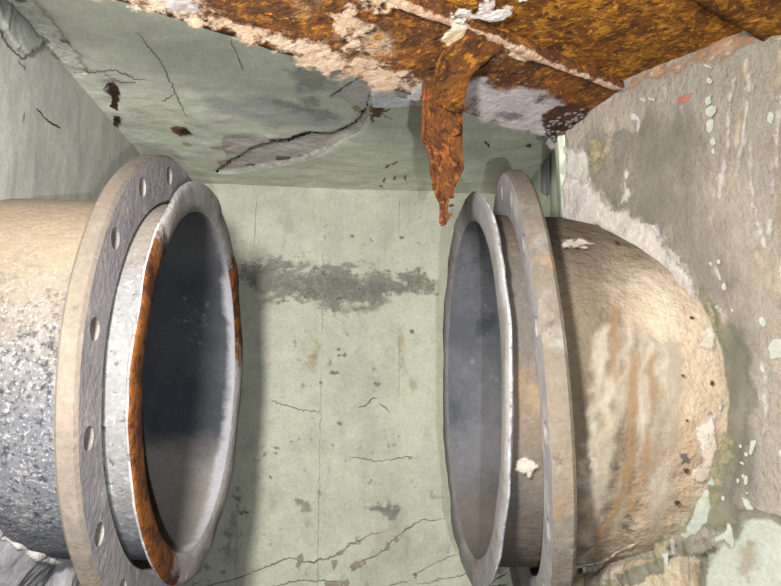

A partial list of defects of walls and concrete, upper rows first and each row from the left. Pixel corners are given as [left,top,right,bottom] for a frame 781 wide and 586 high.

spalling [7,0,88,76]
crack [135,32,187,117]
corrosion [628,34,754,89]
crack [23,109,60,128]
spalling [103,82,120,127]
corrosion [171,126,192,145]
spalling [211,109,370,172]
crack [216,78,372,173]
corrosion [369,105,391,123]
leakage [239,256,438,313]
crack [192,356,445,586]
crack [389,554,466,586]